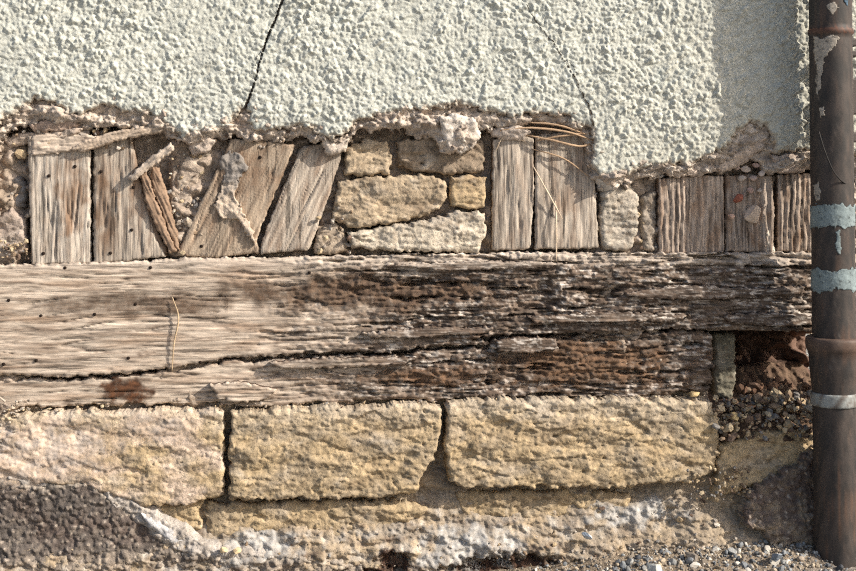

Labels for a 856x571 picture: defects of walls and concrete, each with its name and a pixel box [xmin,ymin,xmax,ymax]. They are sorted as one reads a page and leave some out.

crack [244,0,283,110]
flaking render [0,96,810,244]
flaking render [103,492,274,560]
efflorescence [226,529,293,565]
efflorescence [416,522,524,571]